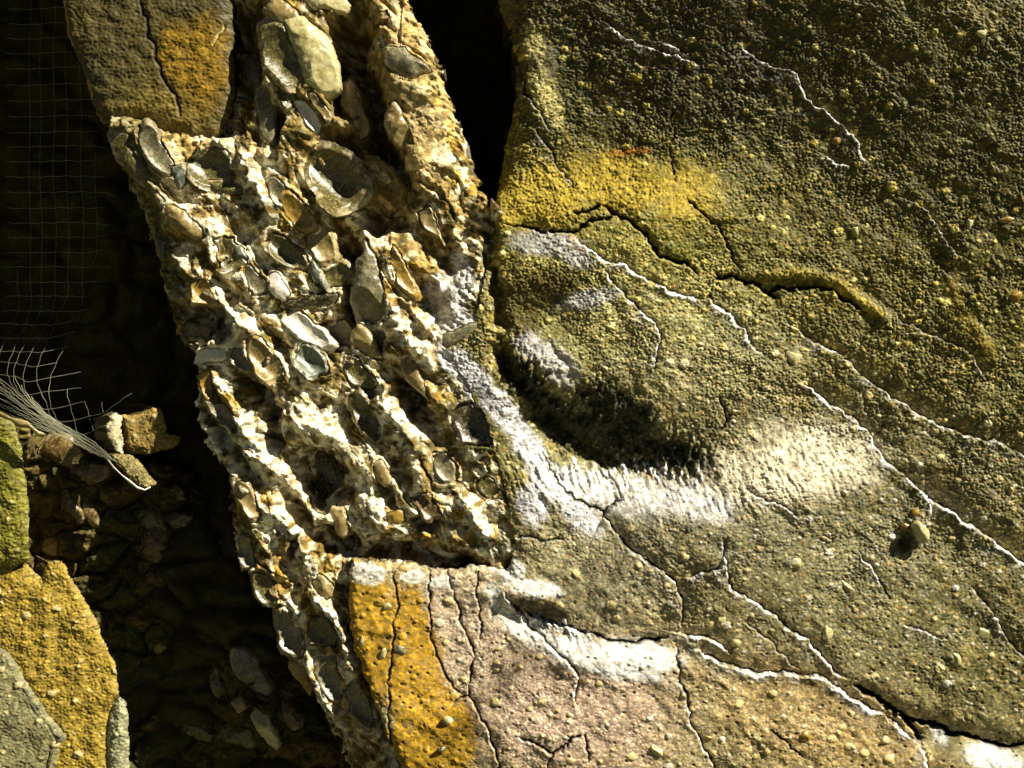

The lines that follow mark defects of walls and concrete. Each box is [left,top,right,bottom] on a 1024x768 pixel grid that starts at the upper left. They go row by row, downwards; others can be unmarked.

crack [140,3,180,112]
leakage [519,334,577,379]
leakage [520,232,592,266]
leakage [566,292,608,307]
crack [517,111,858,366]
leakage [437,345,876,536]
crack [427,566,500,768]
leakage [484,557,684,682]
crack [508,462,1024,768]